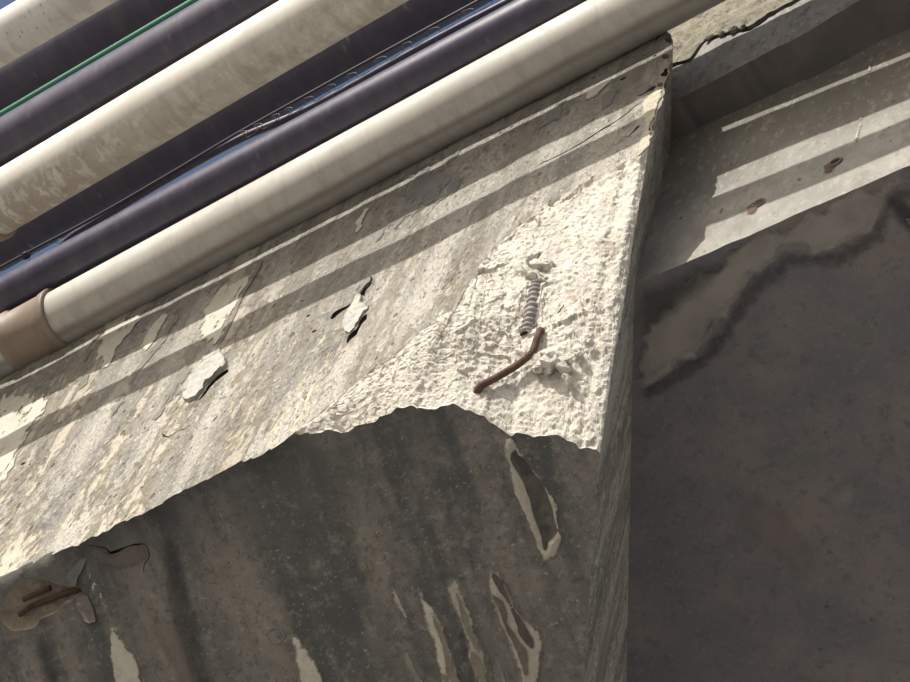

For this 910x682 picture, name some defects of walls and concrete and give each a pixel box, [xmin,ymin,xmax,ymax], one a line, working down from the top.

crack [673,0,800,68]
crack [534,102,641,168]
spalling [293,36,672,452]
water stain [639,191,910,385]
peeling [96,315,141,368]
peeling [182,275,251,402]
peeling [0,391,47,482]
water stain [505,438,561,561]
spalling [0,557,97,631]
water stain [110,619,144,682]
water stain [292,637,322,682]
water stain [418,589,461,682]